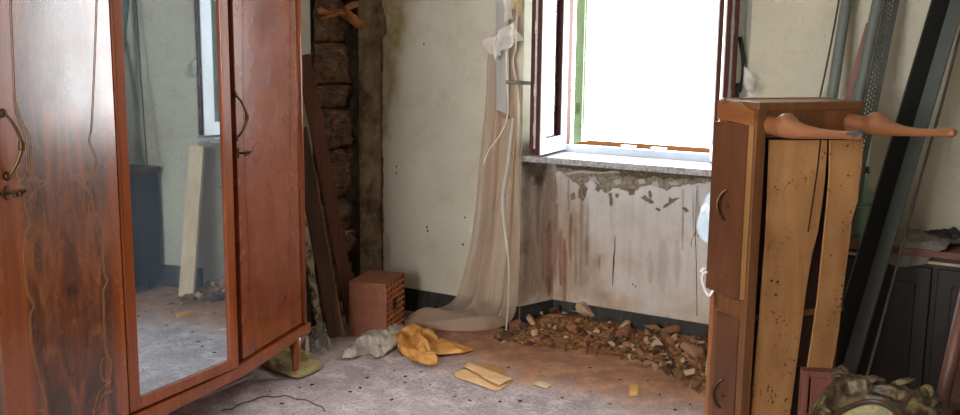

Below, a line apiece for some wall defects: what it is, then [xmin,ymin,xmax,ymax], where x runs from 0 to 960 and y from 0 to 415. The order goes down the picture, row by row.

spalling [310,0,395,279]
water stain [522,162,550,289]
crack [609,242,617,286]
flaking render [556,164,711,212]